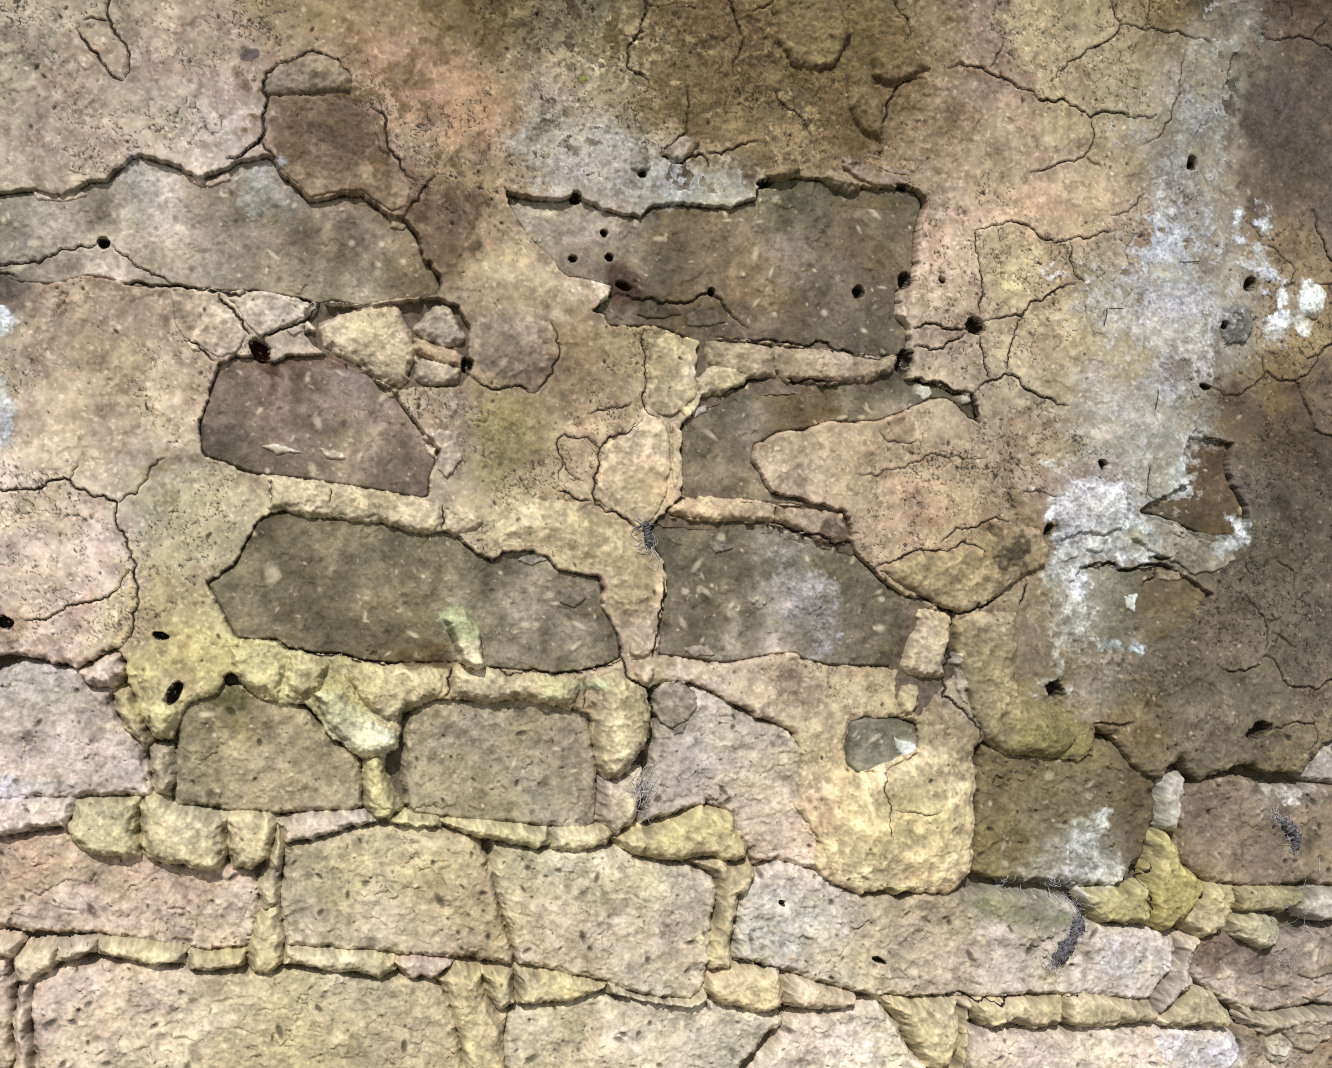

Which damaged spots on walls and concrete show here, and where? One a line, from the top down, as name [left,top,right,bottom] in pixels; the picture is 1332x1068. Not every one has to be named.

crack [77,0,131,81]
crack [880,0,1332,172]
efflorescence [0,375,17,448]
spalling [0,95,462,498]
spalling [506,157,974,667]
crack [556,194,1144,531]
leakage [1040,0,1332,664]
crack [0,458,165,649]
spalling [208,511,619,674]
crack [1080,556,1172,586]
spalling [1054,429,1242,652]
spalling [844,716,918,773]